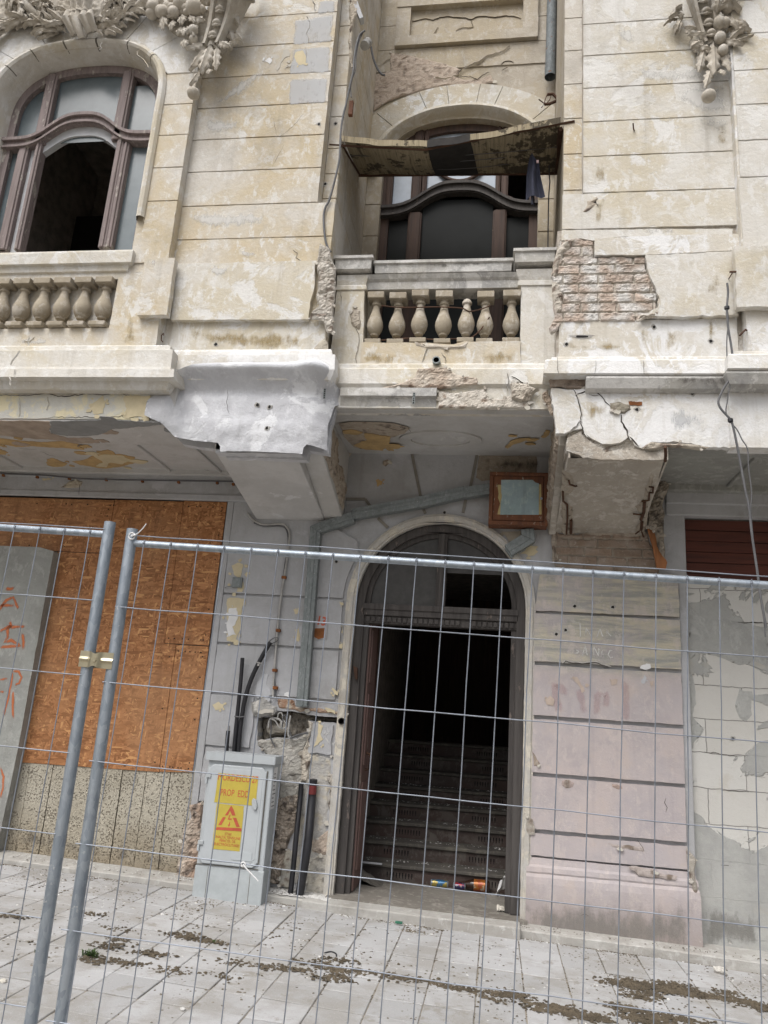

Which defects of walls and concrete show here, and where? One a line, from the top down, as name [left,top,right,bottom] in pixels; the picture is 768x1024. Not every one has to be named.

crack [414,15,521,34]
spalling [373,52,497,110]
spalling [308,244,336,349]
spalling [549,238,660,335]
peeling [0,395,171,481]
spalling [324,422,410,511]
spalling [382,365,709,574]
crack [557,357,639,446]
spalling [251,670,349,893]